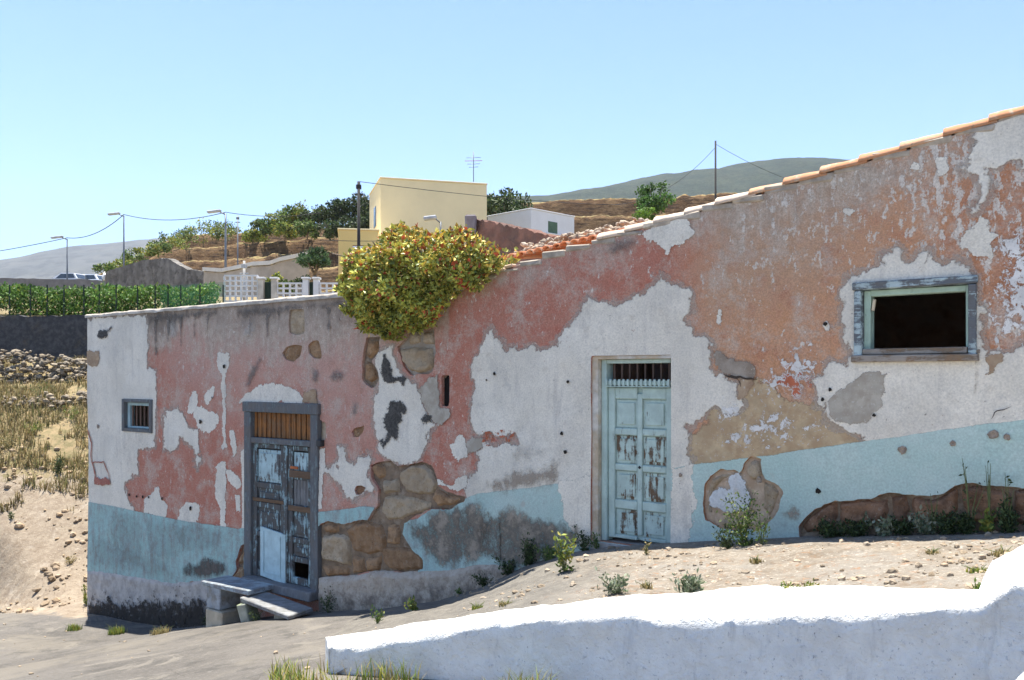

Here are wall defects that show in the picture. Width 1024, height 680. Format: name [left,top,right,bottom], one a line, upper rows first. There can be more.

flaking render [284,309,322,362]
peeling [318,115,1024,577]
peeling [87,313,244,528]
peeling [239,382,304,404]
water stain [412,503,579,567]
water stain [83,586,207,628]